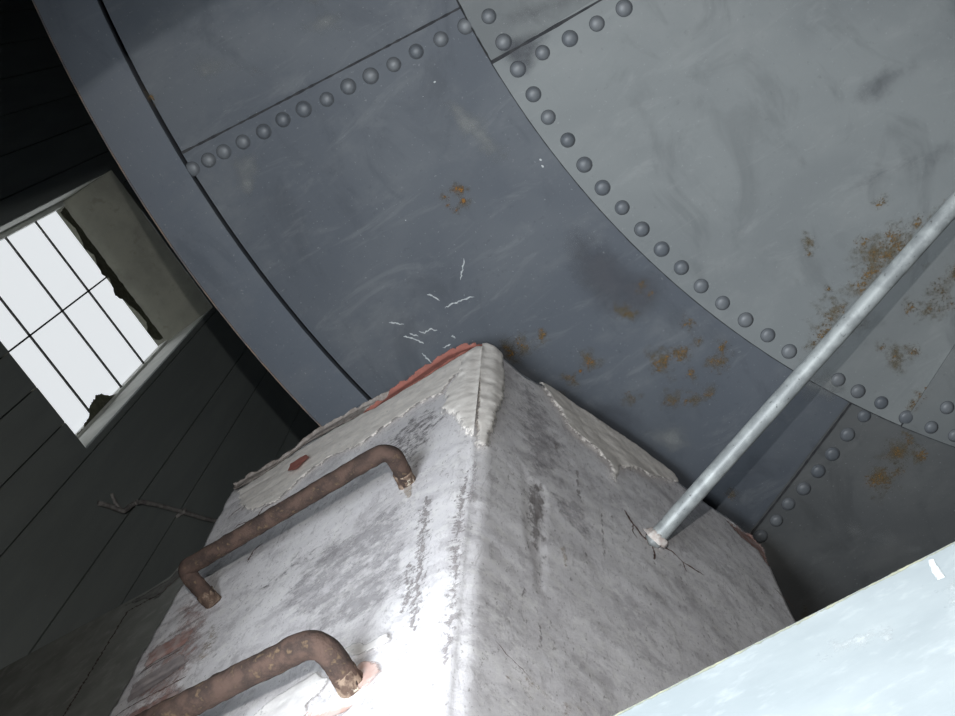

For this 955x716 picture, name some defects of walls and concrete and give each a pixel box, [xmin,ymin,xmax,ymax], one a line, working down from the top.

corrosion [853,217,923,293]
peeling [540,382,678,482]
crack [624,510,702,574]
peeling [615,542,955,716]